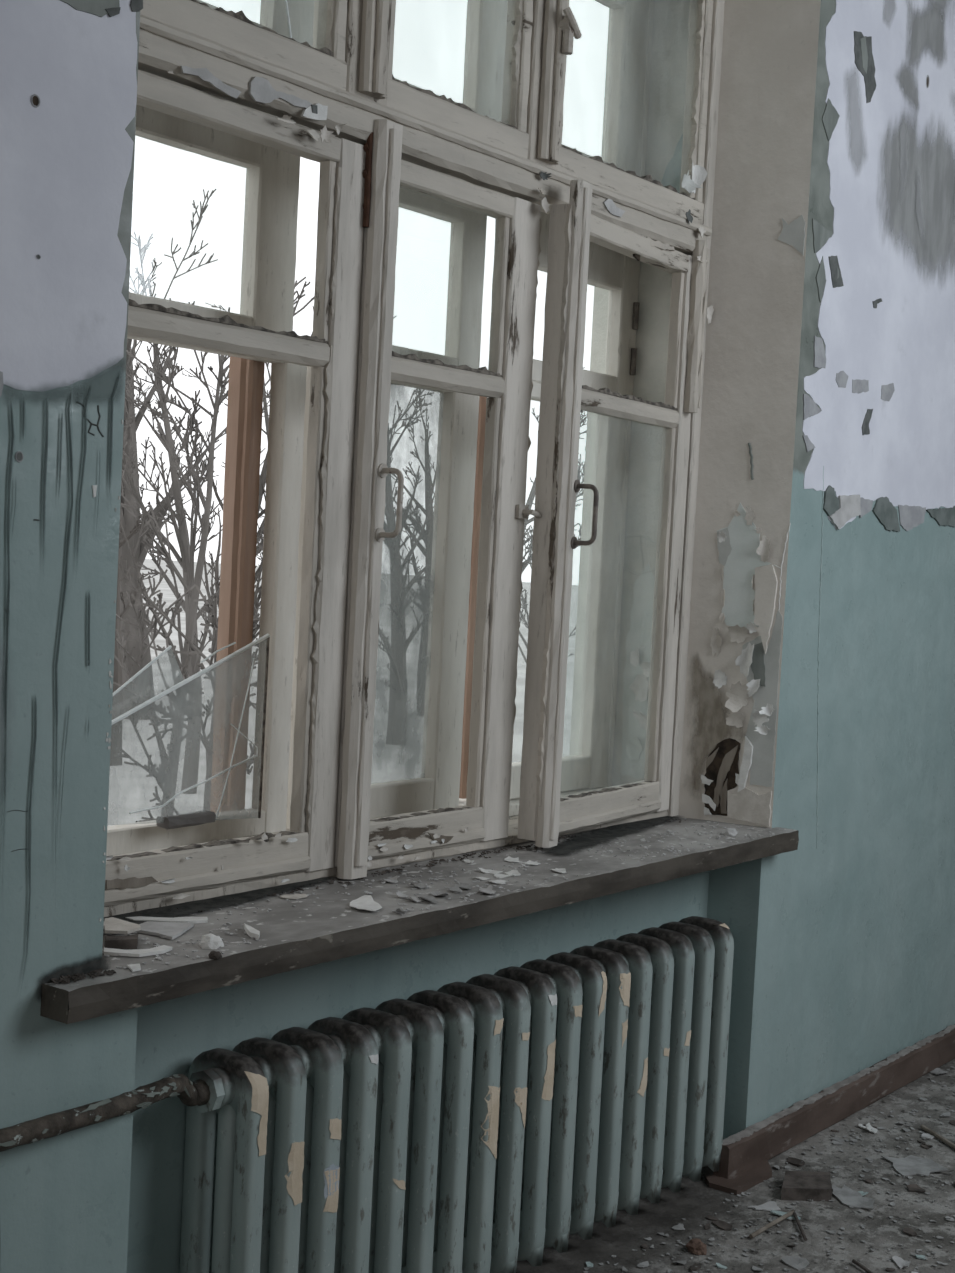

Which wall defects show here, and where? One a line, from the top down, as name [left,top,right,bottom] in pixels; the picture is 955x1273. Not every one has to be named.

peeling [60,0,143,17]
peeling [854,31,876,103]
peeling [822,98,840,141]
peeling [812,218,844,302]
crack [76,401,104,437]
peeling [803,394,822,420]
peeling [813,335,895,435]
peeling [823,485,955,532]
peeling [710,503,783,827]